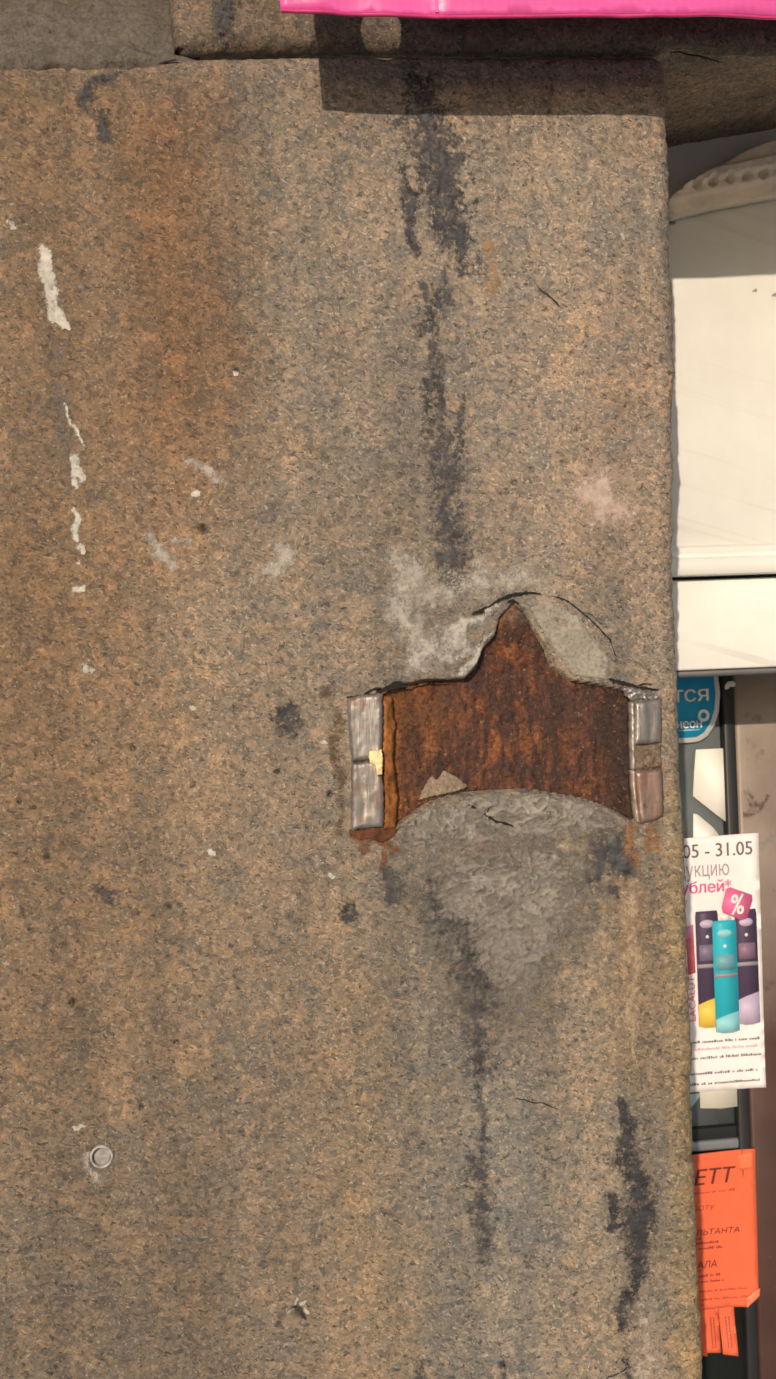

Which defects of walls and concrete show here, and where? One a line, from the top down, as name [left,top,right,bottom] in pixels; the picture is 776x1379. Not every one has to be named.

water stain [385,58,546,662]
flaking render [407,603,501,677]
crack [472,591,659,691]
water stain [604,1097,657,1332]